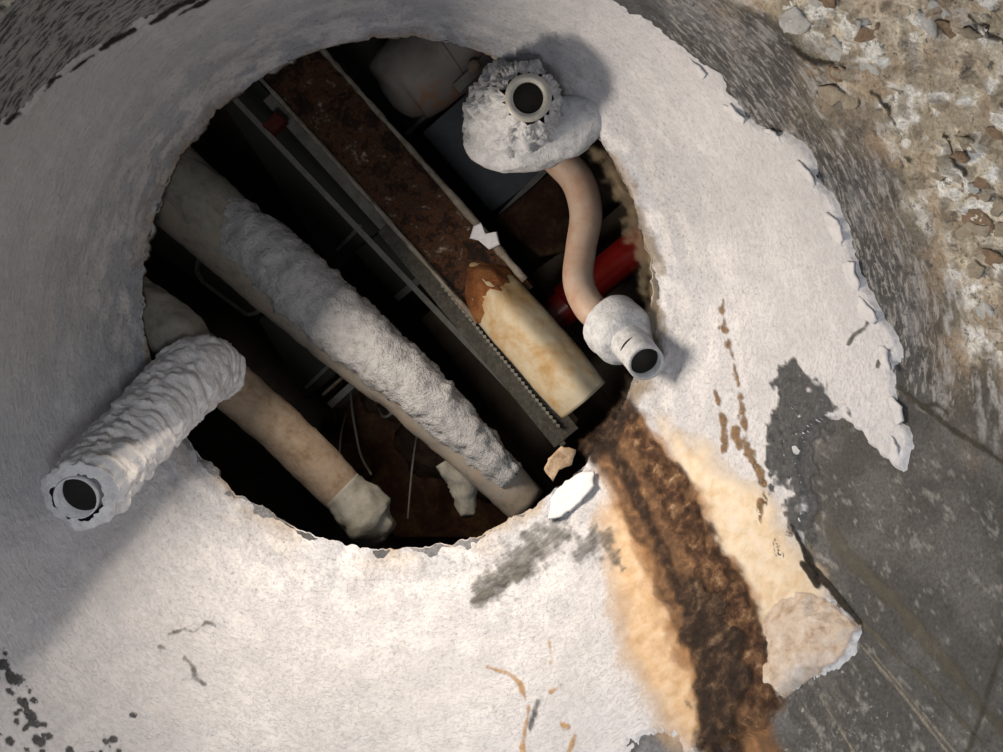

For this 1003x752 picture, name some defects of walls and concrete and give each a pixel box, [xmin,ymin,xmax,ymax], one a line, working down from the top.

flaking render [779,0,880,110]
flaking render [917,0,1003,44]
flaking render [870,91,895,126]
flaking render [986,126,1003,140]
flaking render [942,133,1003,279]
peeling [842,261,878,324]
peeling [753,358,836,543]
peeling [887,396,904,425]
corrosion [581,301,822,752]
crack [790,524,861,625]
peeling [0,651,53,752]
crack [875,662,984,752]